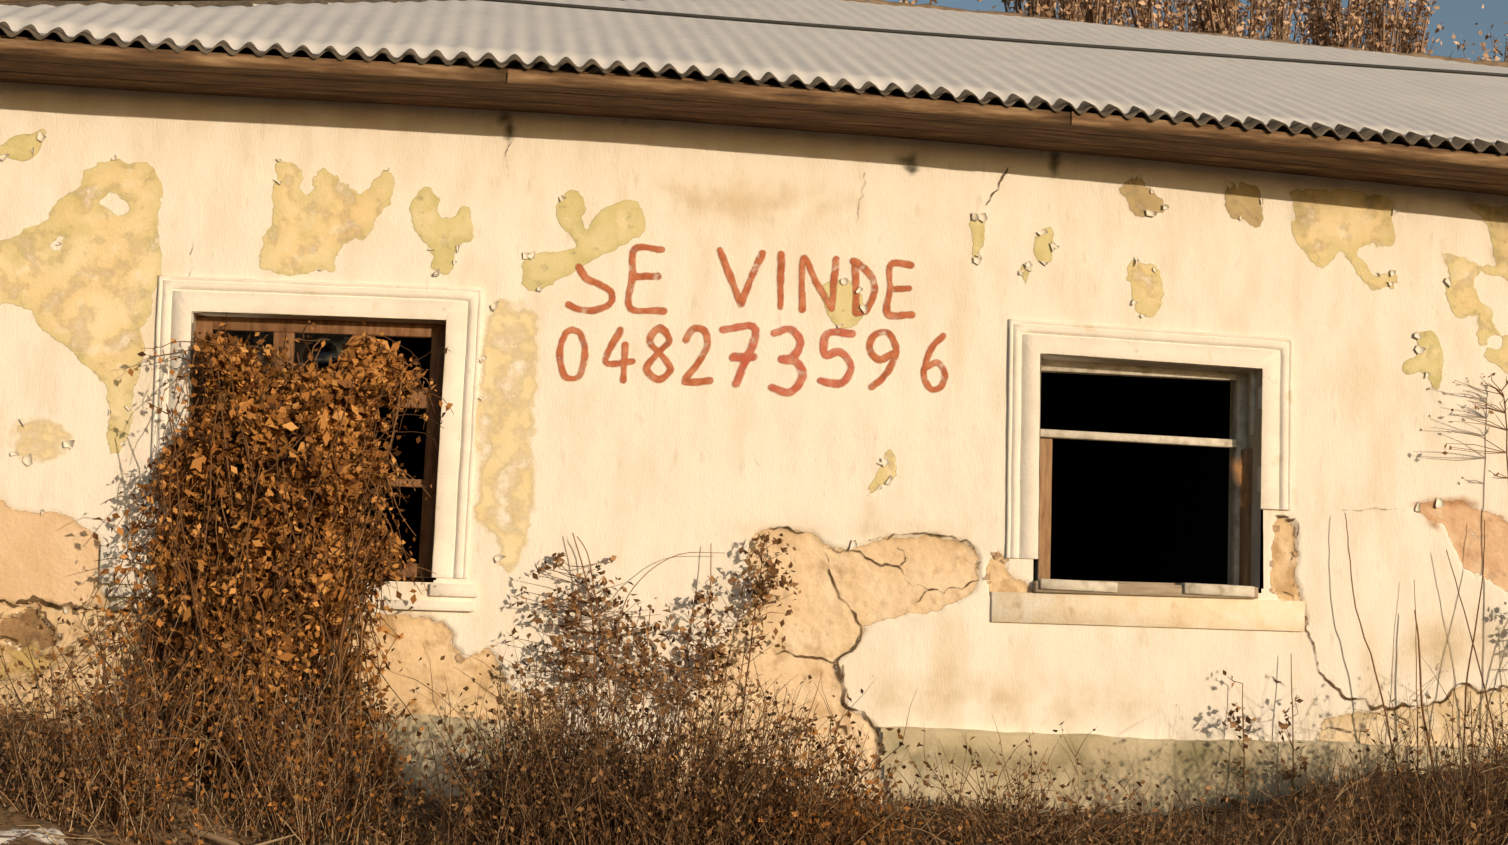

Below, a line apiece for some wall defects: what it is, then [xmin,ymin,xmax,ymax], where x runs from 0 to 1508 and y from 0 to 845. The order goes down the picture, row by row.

peeling [0,155,163,453]
peeling [259,158,395,276]
peeling [409,187,474,276]
peeling [522,190,645,292]
peeling [1290,189,1399,291]
peeling [1445,204,1508,373]
flaking render [0,500,201,737]
flaking render [322,528,1033,808]
crack [772,526,981,808]
crack [1277,515,1507,742]
flaking render [1319,685,1508,747]
flaking render [1414,497,1508,592]